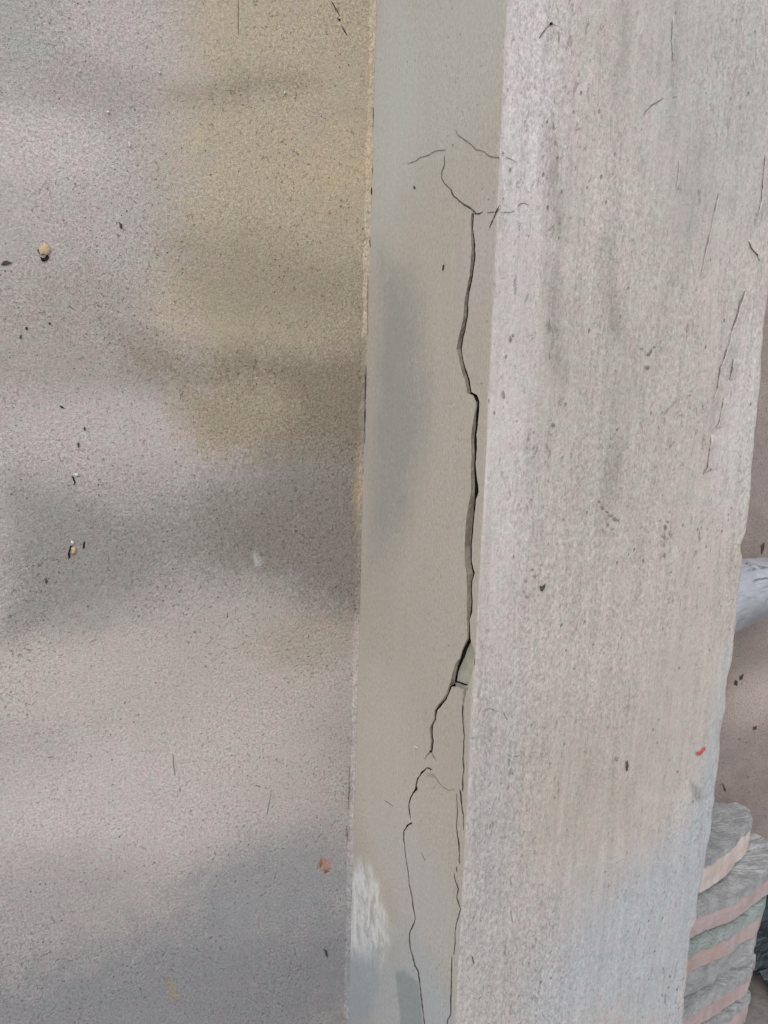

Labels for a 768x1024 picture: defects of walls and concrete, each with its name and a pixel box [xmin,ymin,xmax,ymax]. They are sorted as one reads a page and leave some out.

crack [384,130,528,1024]